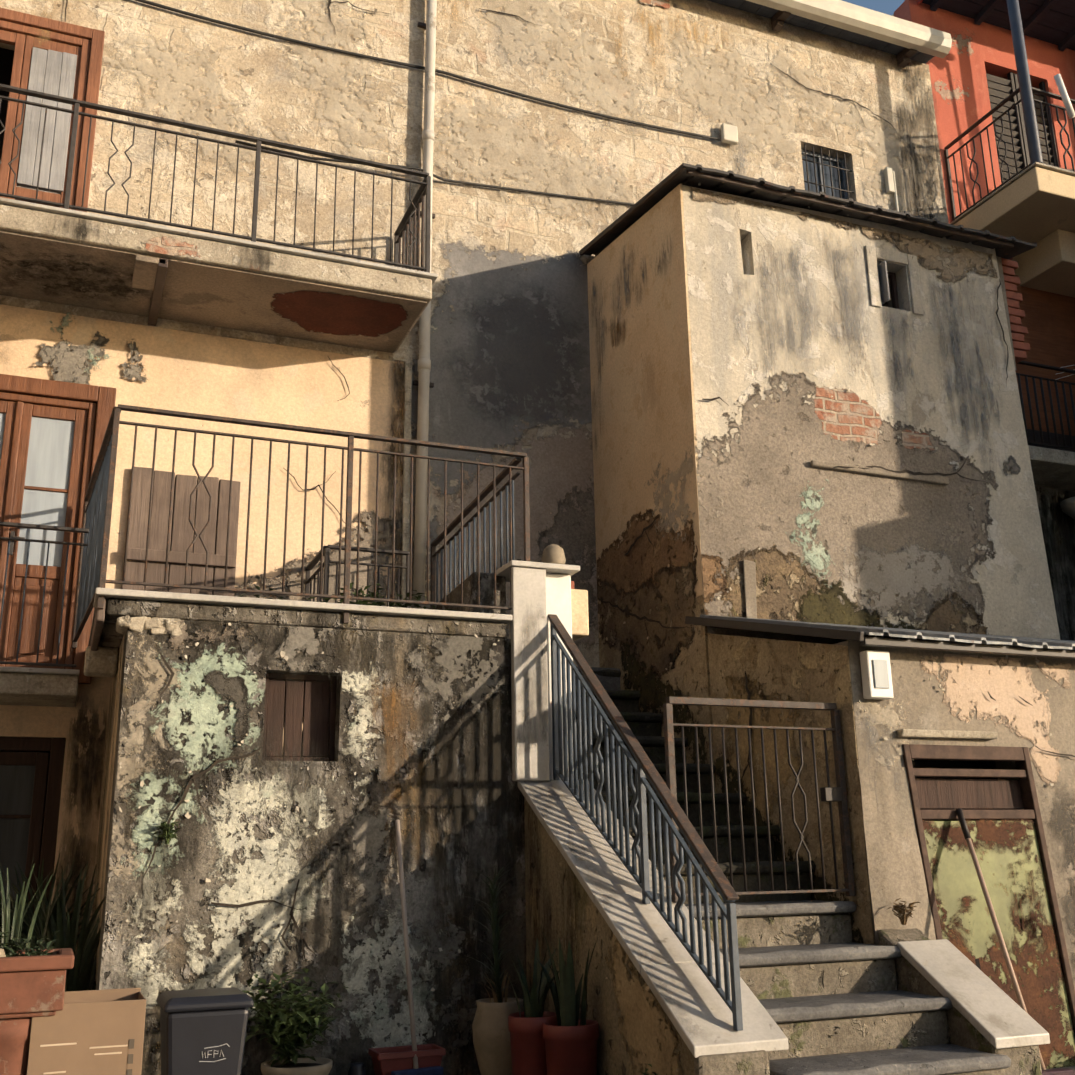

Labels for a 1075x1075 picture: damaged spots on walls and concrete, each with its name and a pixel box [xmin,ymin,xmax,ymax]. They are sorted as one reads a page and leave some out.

flaking render [814,386,894,446]